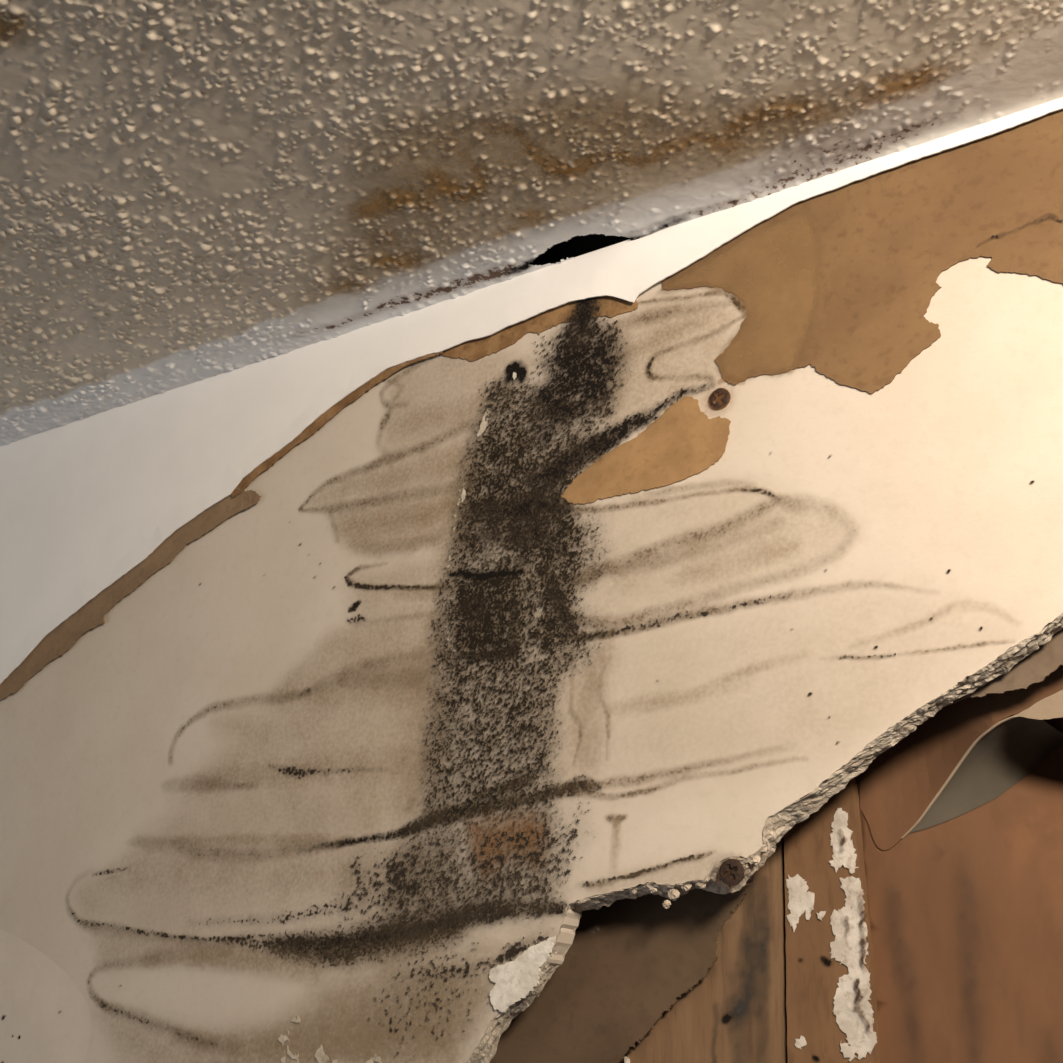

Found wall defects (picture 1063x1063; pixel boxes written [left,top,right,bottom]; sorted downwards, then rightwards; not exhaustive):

water stain [870,66,932,98]
water stain [358,101,804,237]
water stain [699,121,934,216]
crack [508,212,691,274]
water stain [315,265,516,329]
water stain [637,291,748,323]
water stain [72,297,803,1058]
spalling [466,613,1063,1063]